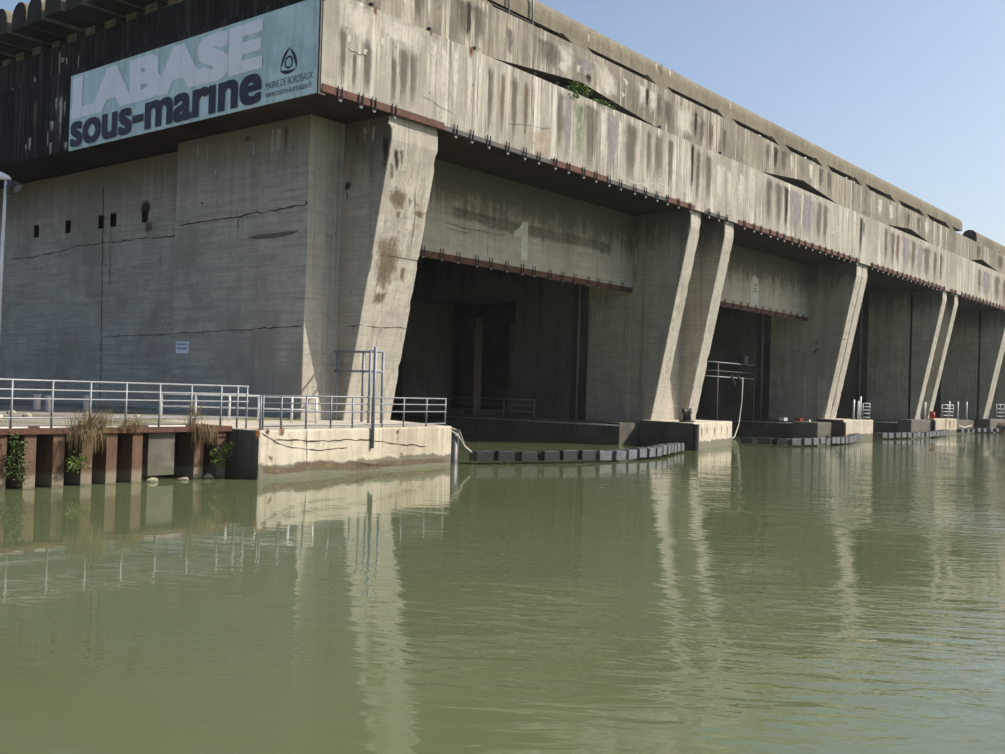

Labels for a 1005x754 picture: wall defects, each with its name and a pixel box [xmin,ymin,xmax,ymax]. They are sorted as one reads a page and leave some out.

leakage [458,0,484,32]
leakage [341,29,371,87]
leakage [393,50,416,95]
leakage [431,44,528,133]
leakage [640,85,671,119]
leakage [357,126,403,178]
leakage [558,94,636,171]
leakage [647,132,673,180]
leakage [691,113,744,203]
leakage [767,181,827,234]
leakage [885,230,943,276]
crack [11,186,306,390]